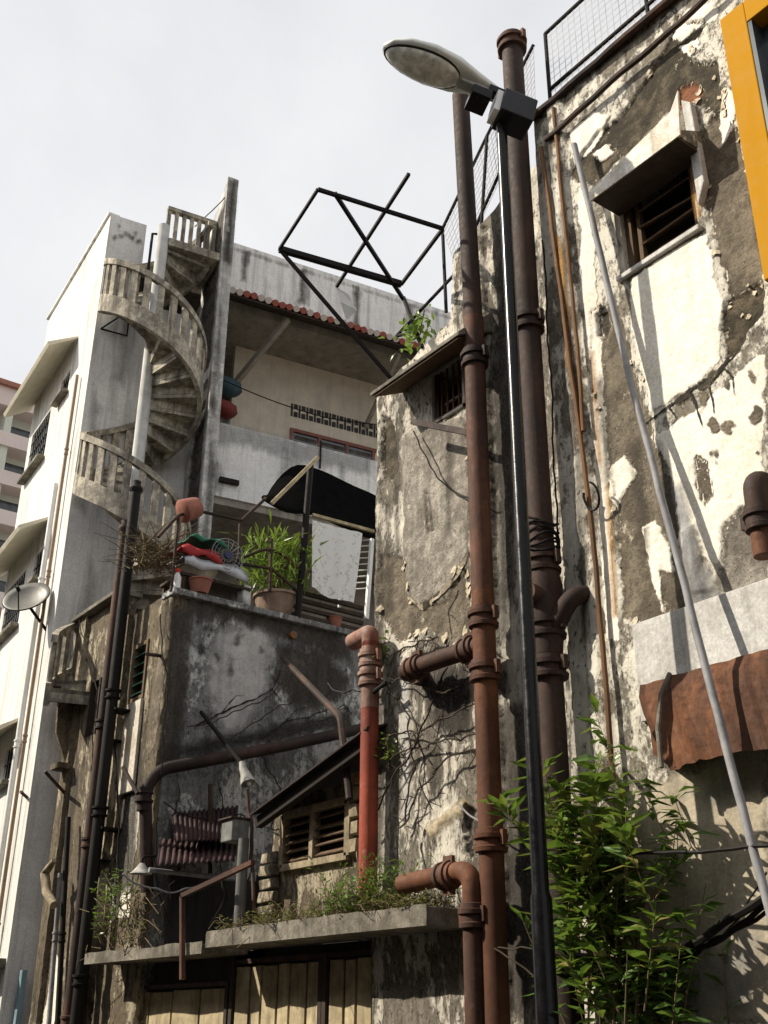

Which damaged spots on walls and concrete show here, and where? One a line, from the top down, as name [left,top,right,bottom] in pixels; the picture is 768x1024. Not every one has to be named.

peeling [567,1,767,641]
crack [646,354,736,429]
flaking render [381,415,399,483]
flaking render [375,553,472,643]
leakage [164,594,350,763]